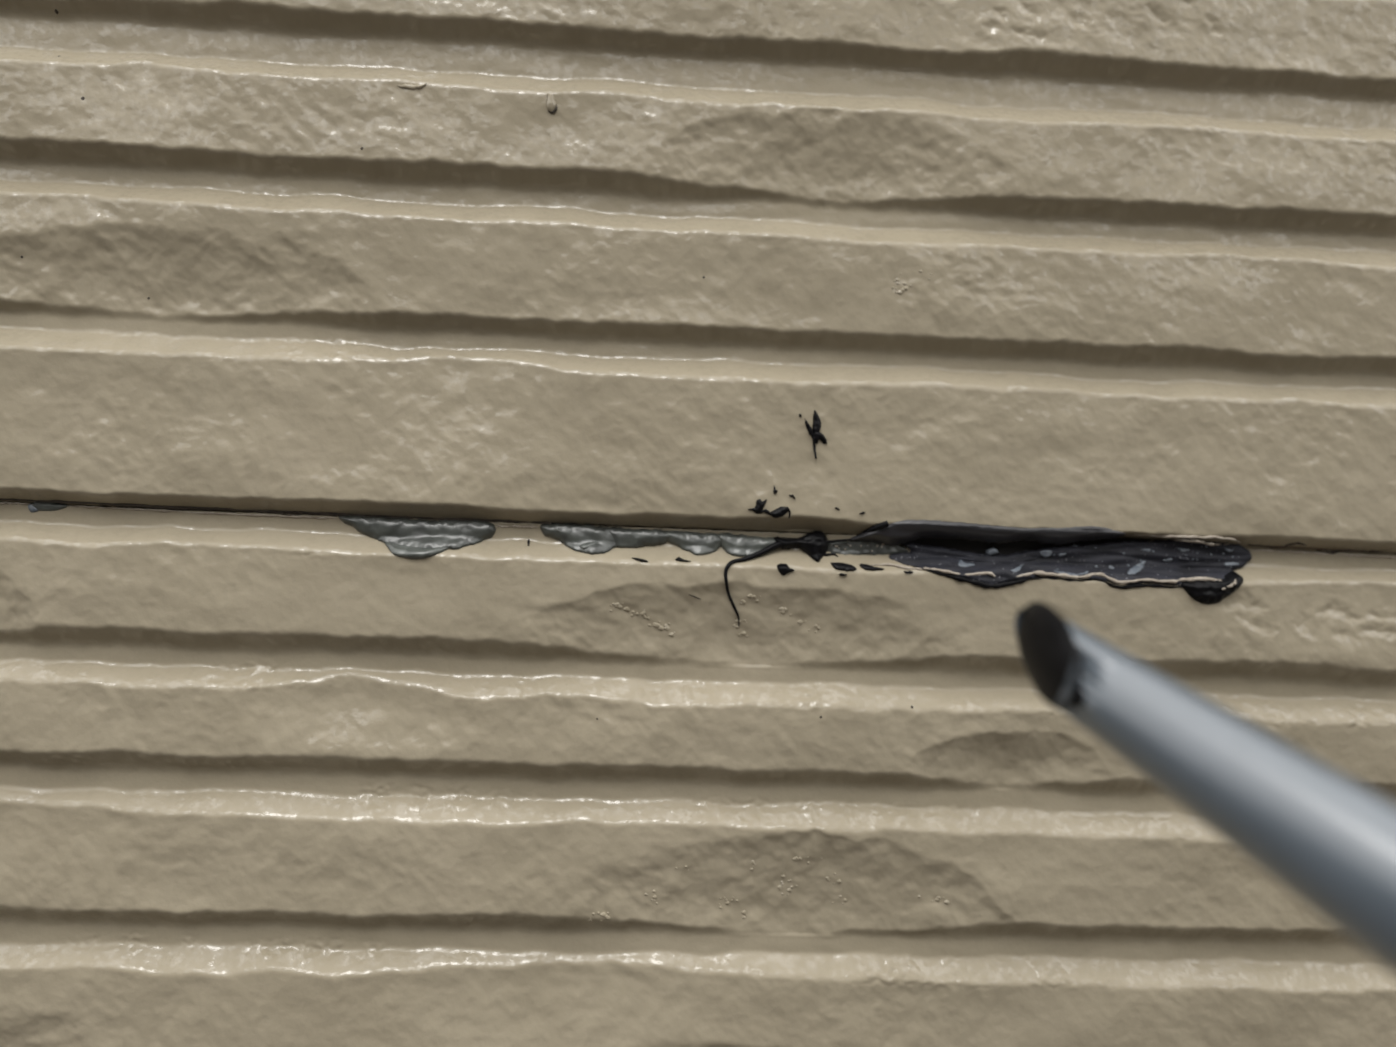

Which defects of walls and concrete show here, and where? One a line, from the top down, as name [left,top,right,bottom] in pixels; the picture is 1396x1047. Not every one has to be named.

crack [1248,542,1396,559]